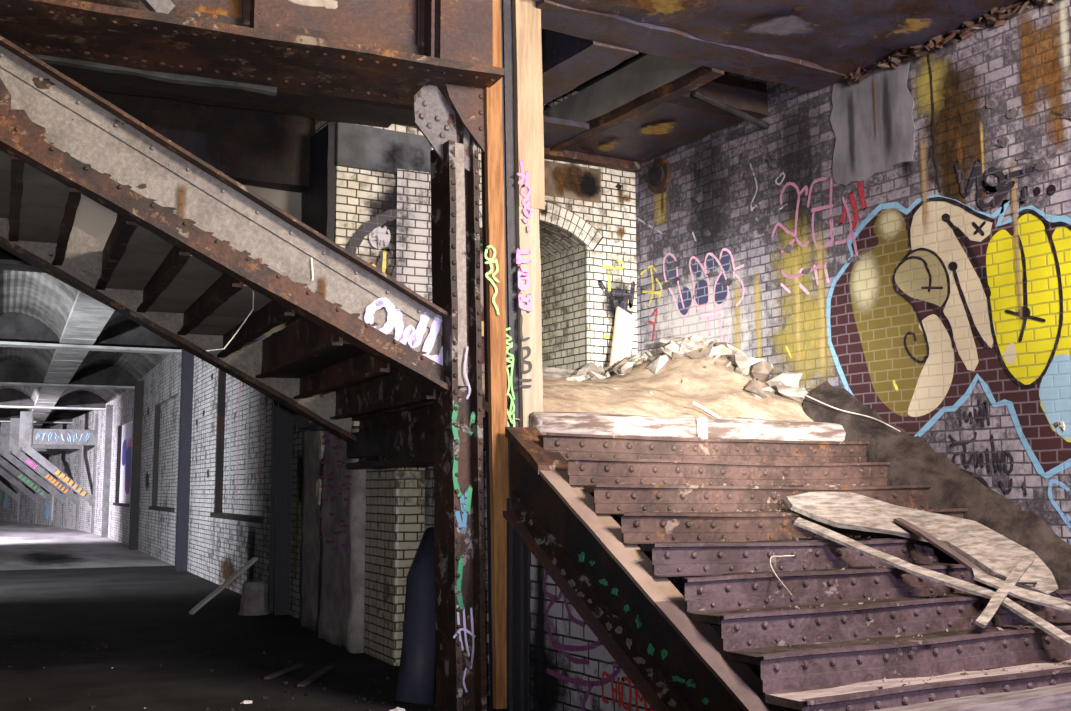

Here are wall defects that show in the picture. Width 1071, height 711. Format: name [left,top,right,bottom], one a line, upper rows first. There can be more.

rust [618,0,705,21]
peeling [32,77,55,89]
rust [1021,11,1067,144]
peeling [0,78,49,142]
rust [170,187,185,218]
peeling [148,198,230,245]
leakage [544,160,601,203]
leakage [695,150,721,249]
leakage [772,117,834,389]
rust [306,279,326,299]